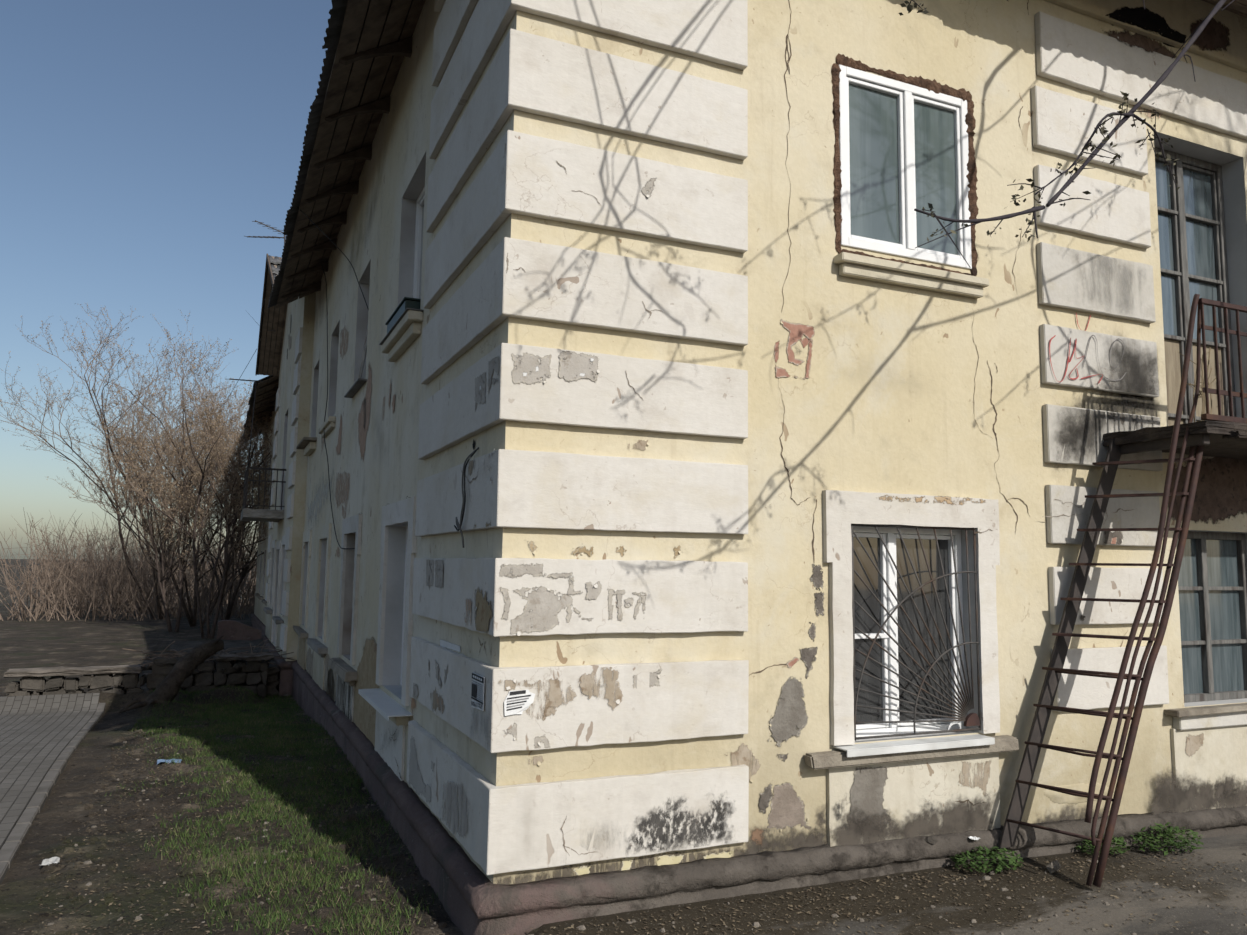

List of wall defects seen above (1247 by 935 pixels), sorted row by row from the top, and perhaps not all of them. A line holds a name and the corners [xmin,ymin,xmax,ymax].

crack [782,2,792,309]
flaking render [831,53,979,276]
crack [778,379,817,561]
crack [972,312,1135,535]
leakage [1059,344,1157,453]
flaking render [1168,453,1247,524]
peeling [464,541,647,636]
peeling [499,667,662,748]
flaking render [768,564,825,762]
leakage [498,799,993,885]
flaking render [724,743,812,832]
leakage [1151,772,1247,815]